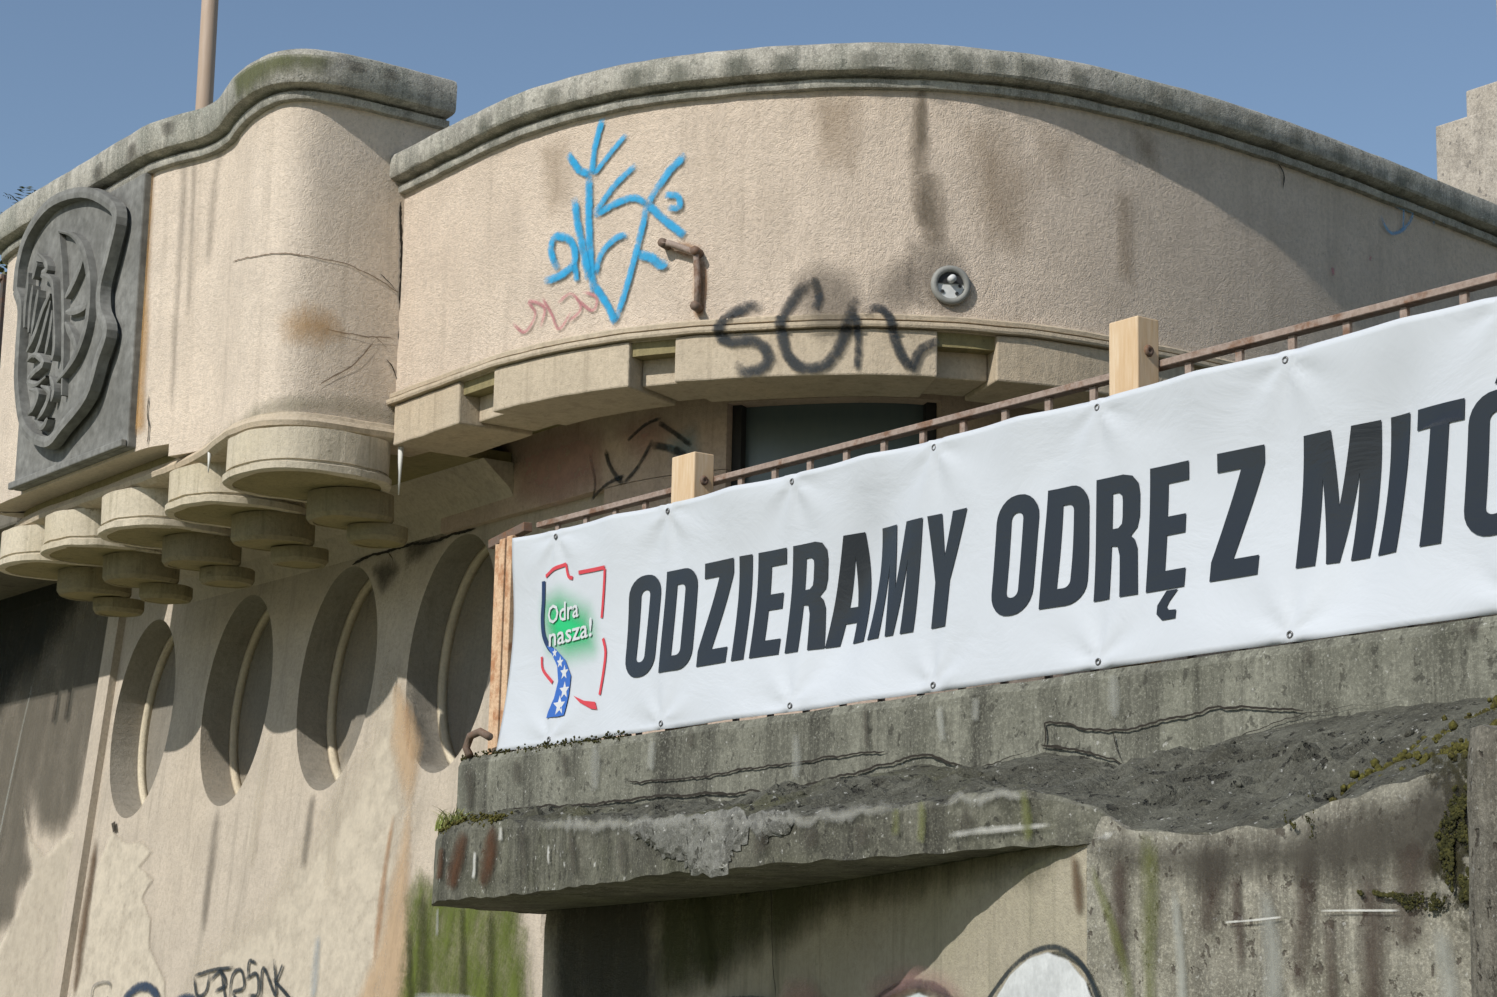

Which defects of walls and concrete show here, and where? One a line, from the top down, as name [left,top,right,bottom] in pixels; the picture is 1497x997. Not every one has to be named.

crack [235,202,403,384]
water stain [0,583,108,921]
crack [493,695,1411,812]
water stain [1106,836,1140,956]
water stain [1174,903,1184,997]
water stain [1160,785,1458,973]